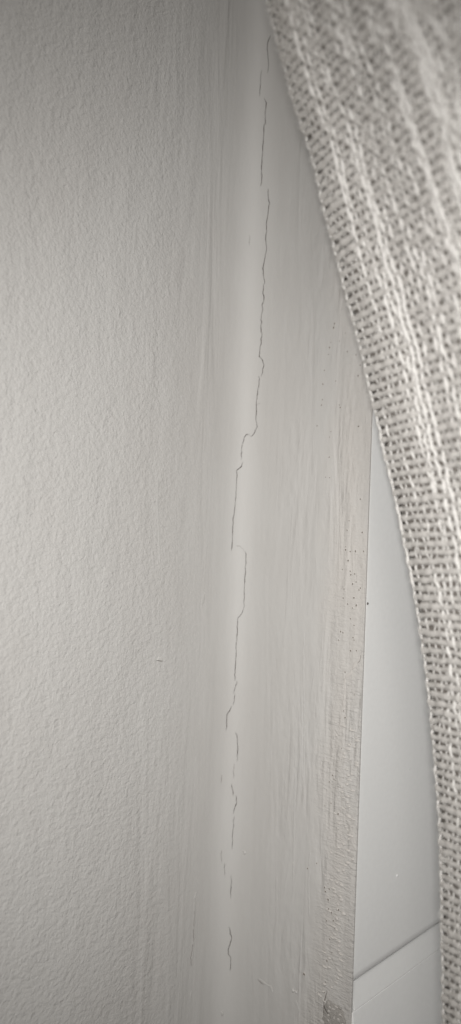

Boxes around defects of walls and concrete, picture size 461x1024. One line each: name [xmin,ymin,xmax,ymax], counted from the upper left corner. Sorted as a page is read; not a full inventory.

crack [221,35,271,898]